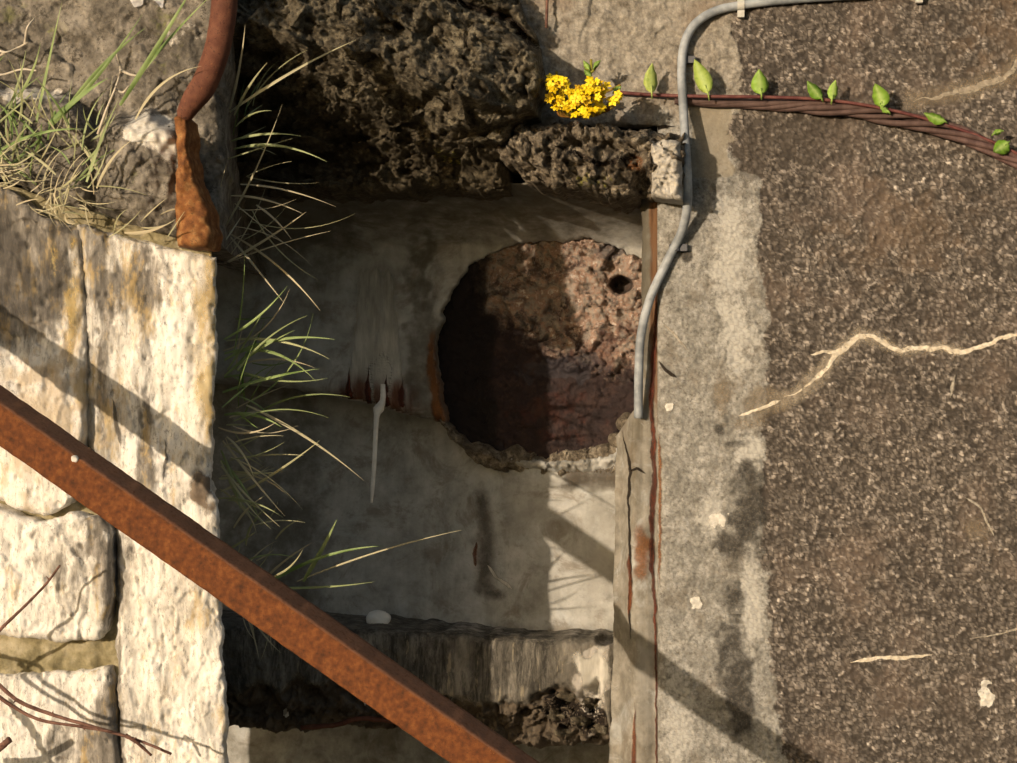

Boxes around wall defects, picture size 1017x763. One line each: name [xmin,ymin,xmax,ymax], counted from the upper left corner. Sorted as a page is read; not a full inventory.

crack [913,58,1017,102]
corrosion [339,368,412,413]
crack [739,329,1017,416]
crack [622,431,644,639]
corrosion [635,297,661,763]
damp [716,461,767,560]
damp [715,589,754,737]